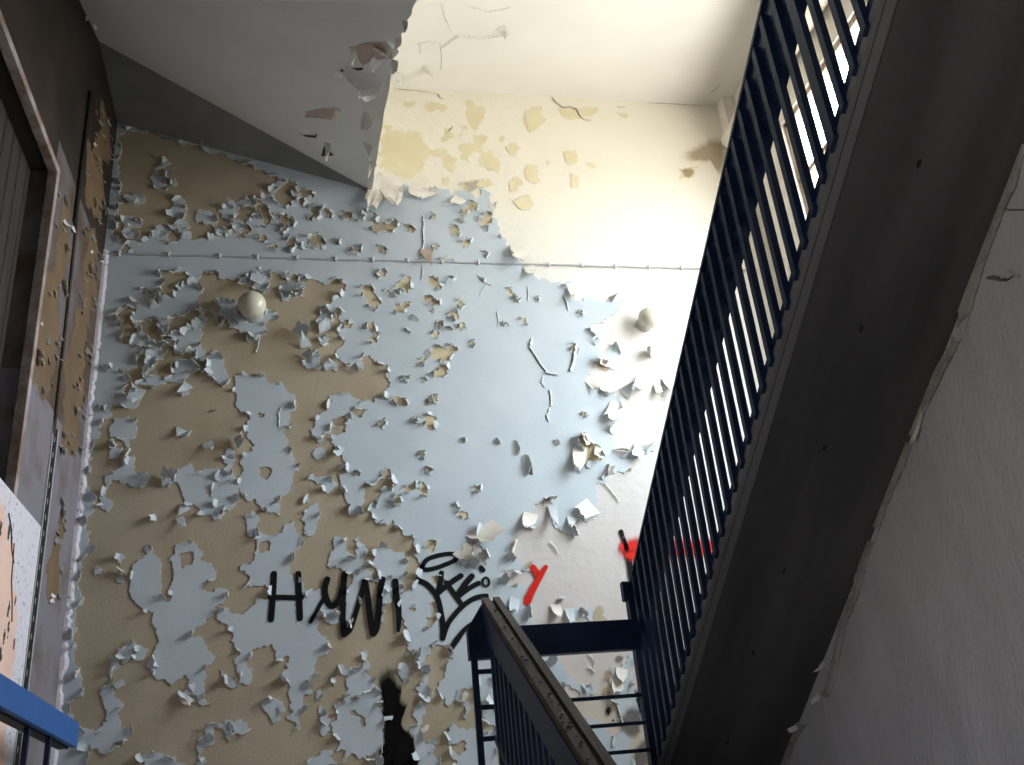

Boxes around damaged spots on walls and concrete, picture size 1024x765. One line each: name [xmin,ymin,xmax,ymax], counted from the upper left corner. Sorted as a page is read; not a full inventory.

peeling [32,20,727,765]
peeling [674,259,766,541]